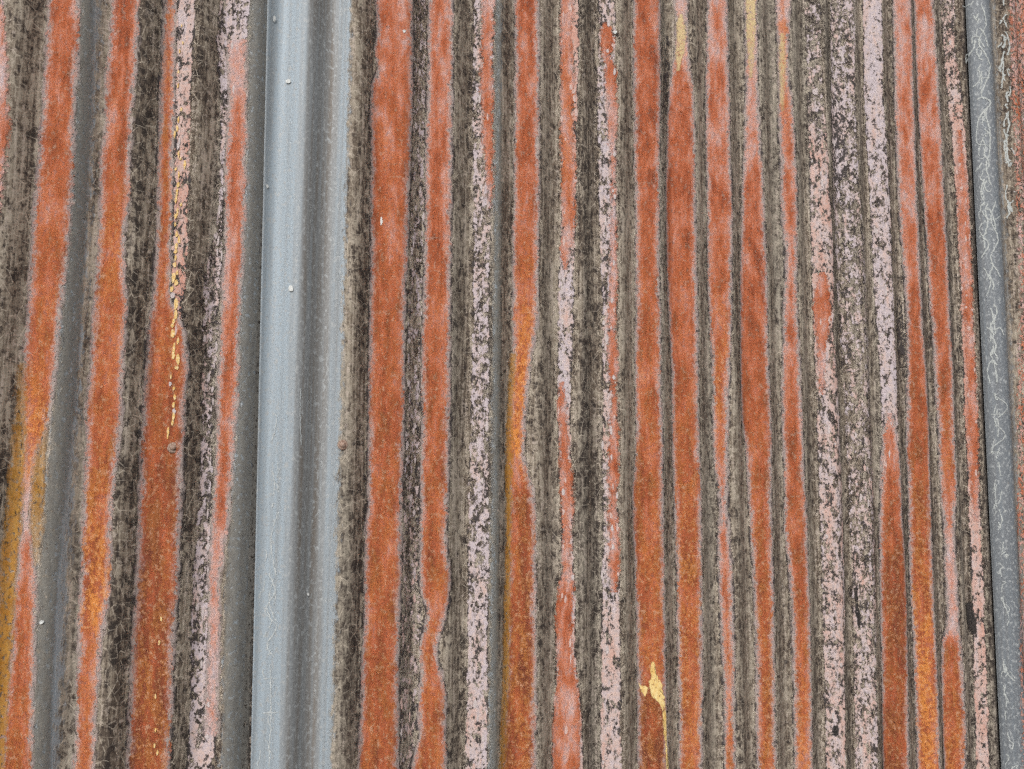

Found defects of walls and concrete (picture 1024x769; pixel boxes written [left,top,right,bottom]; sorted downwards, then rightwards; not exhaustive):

corrosion [0,0,81,769]
corrosion [71,0,141,769]
corrosion [123,0,192,769]
corrosion [202,39,249,737]
corrosion [356,0,455,769]
corrosion [502,0,541,769]
corrosion [551,381,582,769]
corrosion [558,0,578,270]
corrosion [600,0,814,769]
peeling [804,0,898,769]
corrosion [878,0,980,769]